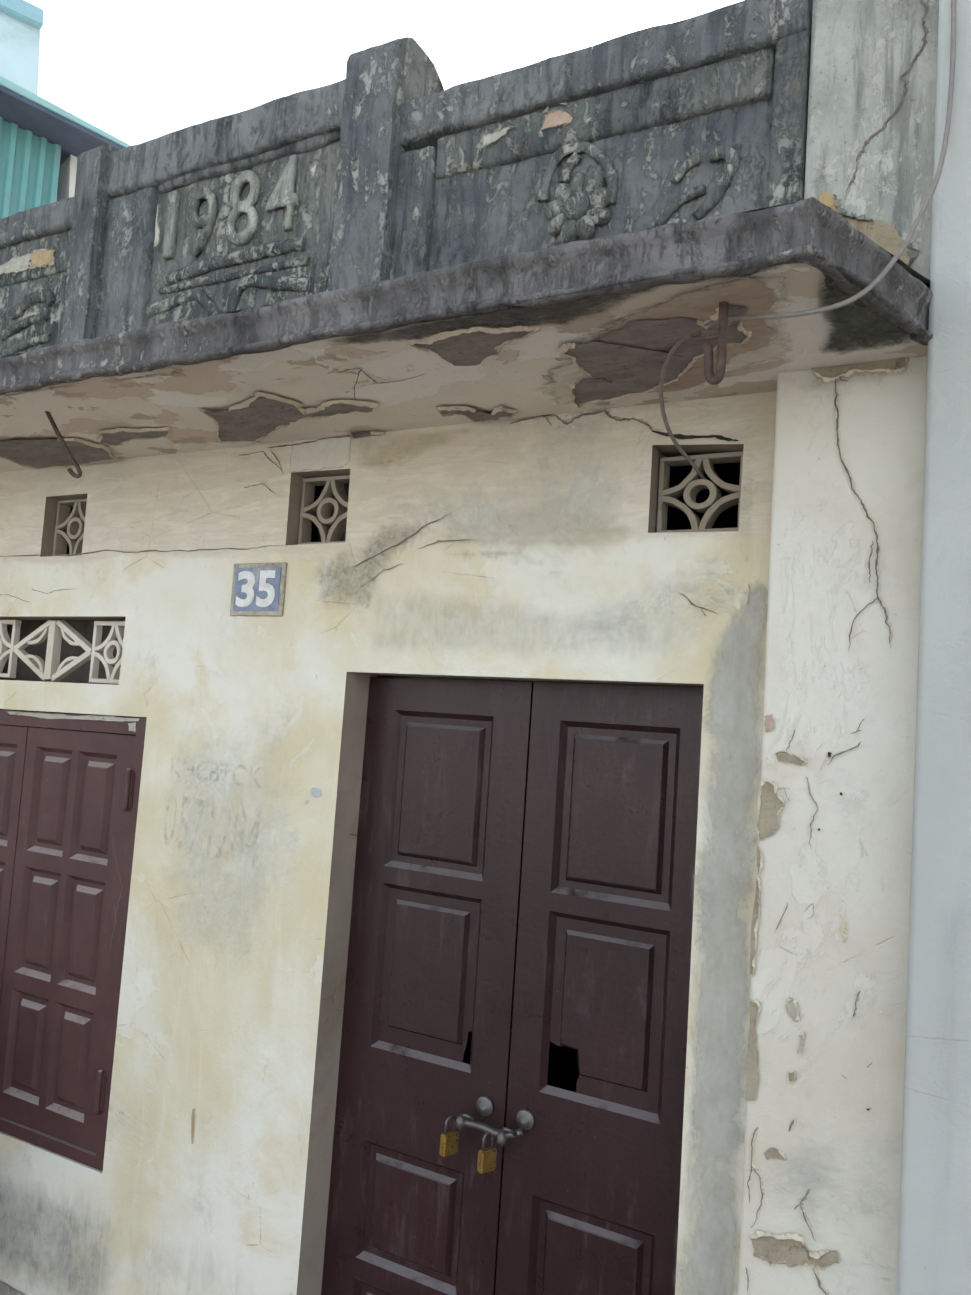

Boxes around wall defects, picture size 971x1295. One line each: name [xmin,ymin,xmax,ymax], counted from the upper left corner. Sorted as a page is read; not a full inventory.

peeling [538,103,599,137]
crack [844,0,929,198]
spalling [819,191,919,267]
peeling [0,246,55,277]
spalling [406,326,541,366]
spalling [199,392,379,443]
spalling [0,427,171,470]
crack [834,369,893,648]
crack [0,545,278,557]
crack [354,512,478,590]
spalling [749,781,785,977]
spalling [749,1231,839,1271]